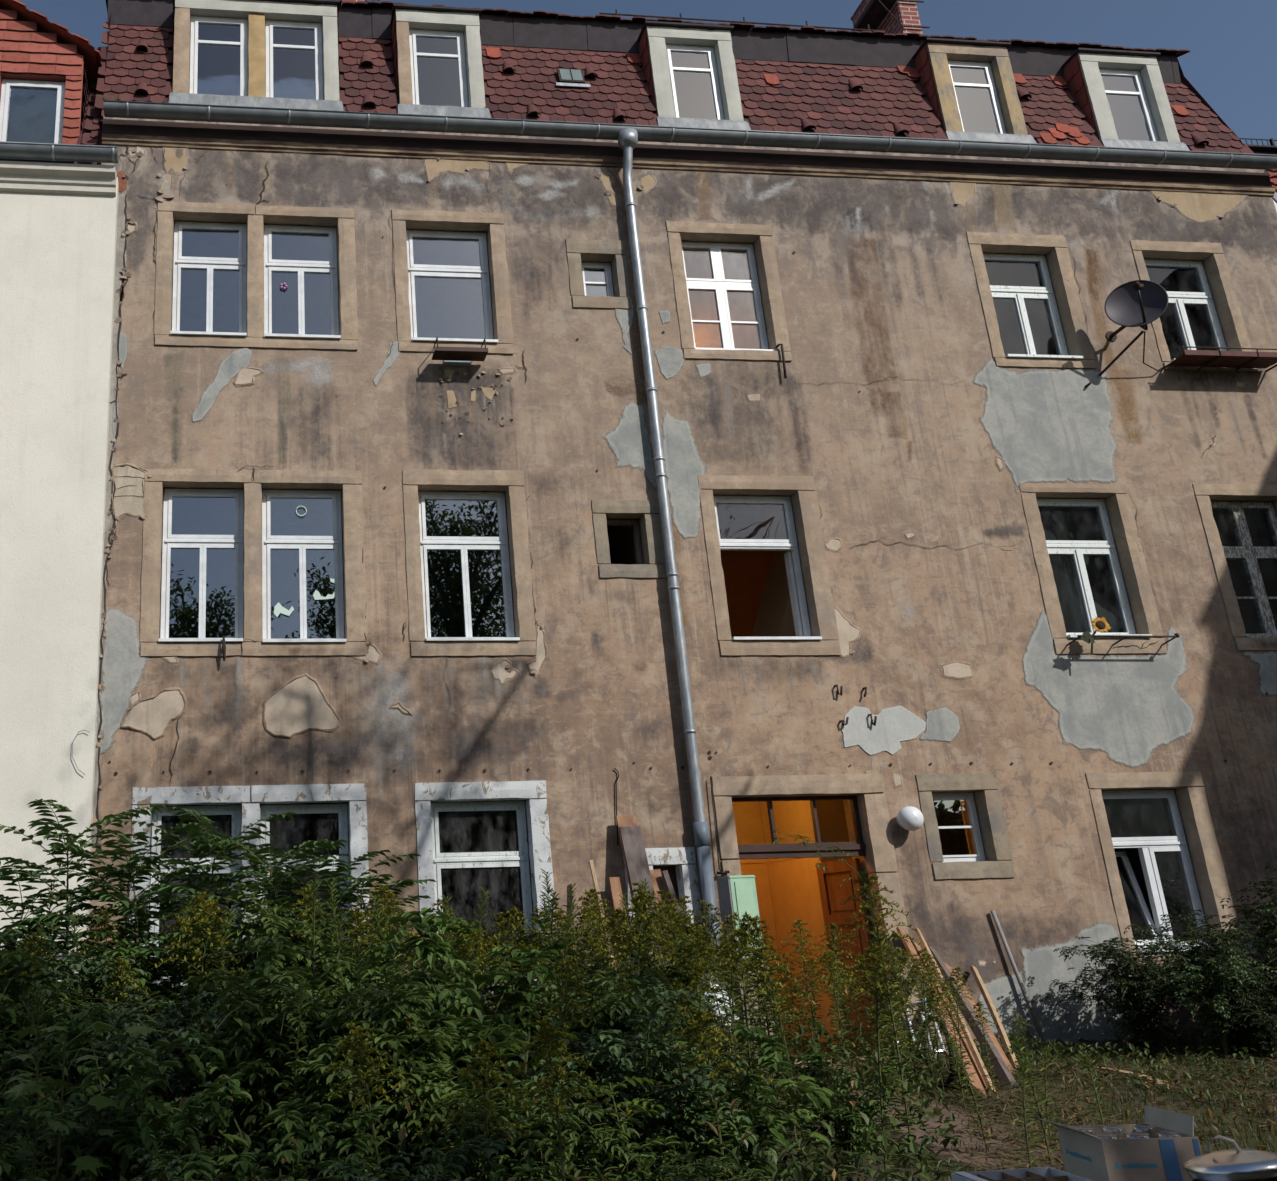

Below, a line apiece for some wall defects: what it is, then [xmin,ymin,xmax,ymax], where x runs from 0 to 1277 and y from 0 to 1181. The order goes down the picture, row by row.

flaking render [128,146,146,158]
flaking render [155,147,189,202]
flaking render [1147,181,1249,224]
flaking render [233,366,264,388]
flaking render [92,170,152,851]
crack [105,465,146,586]
flaking render [120,687,188,741]